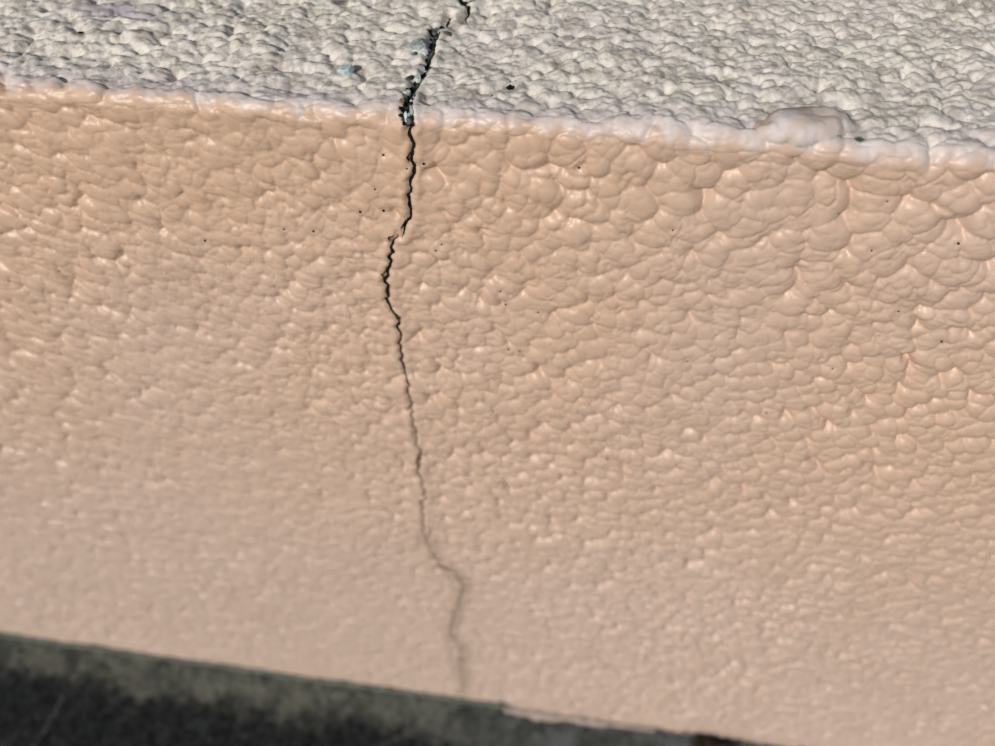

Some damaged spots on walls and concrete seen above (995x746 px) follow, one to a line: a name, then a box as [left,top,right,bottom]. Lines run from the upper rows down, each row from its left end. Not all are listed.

crack [381,0,475,690]